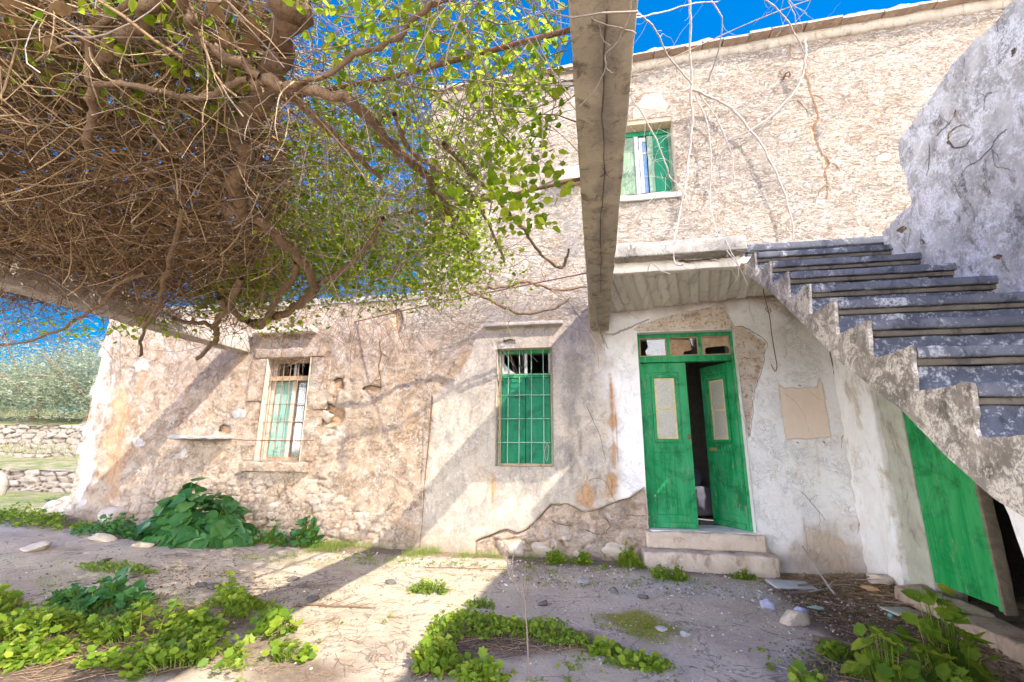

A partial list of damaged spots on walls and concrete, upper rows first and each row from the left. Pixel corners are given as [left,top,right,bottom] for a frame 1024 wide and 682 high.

crack [592,9,612,293]
crack [784,44,840,199]
crack [922,109,956,176]
crack [961,129,1012,175]
spalling [321,378,345,436]
spalling [634,305,768,437]
spalling [476,488,650,561]